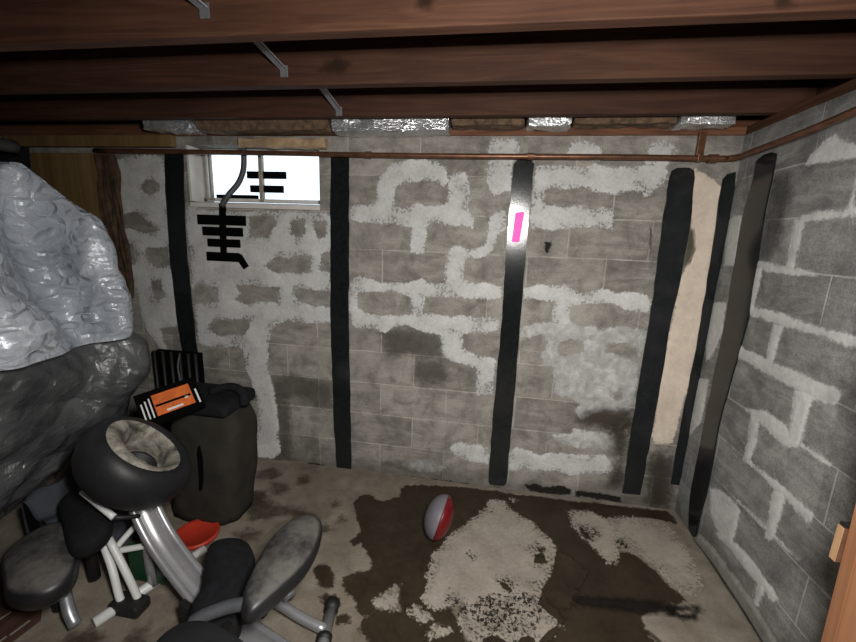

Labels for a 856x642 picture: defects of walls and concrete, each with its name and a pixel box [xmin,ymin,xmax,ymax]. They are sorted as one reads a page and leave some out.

water stain [683,232,695,265]
water stain [579,409,632,486]